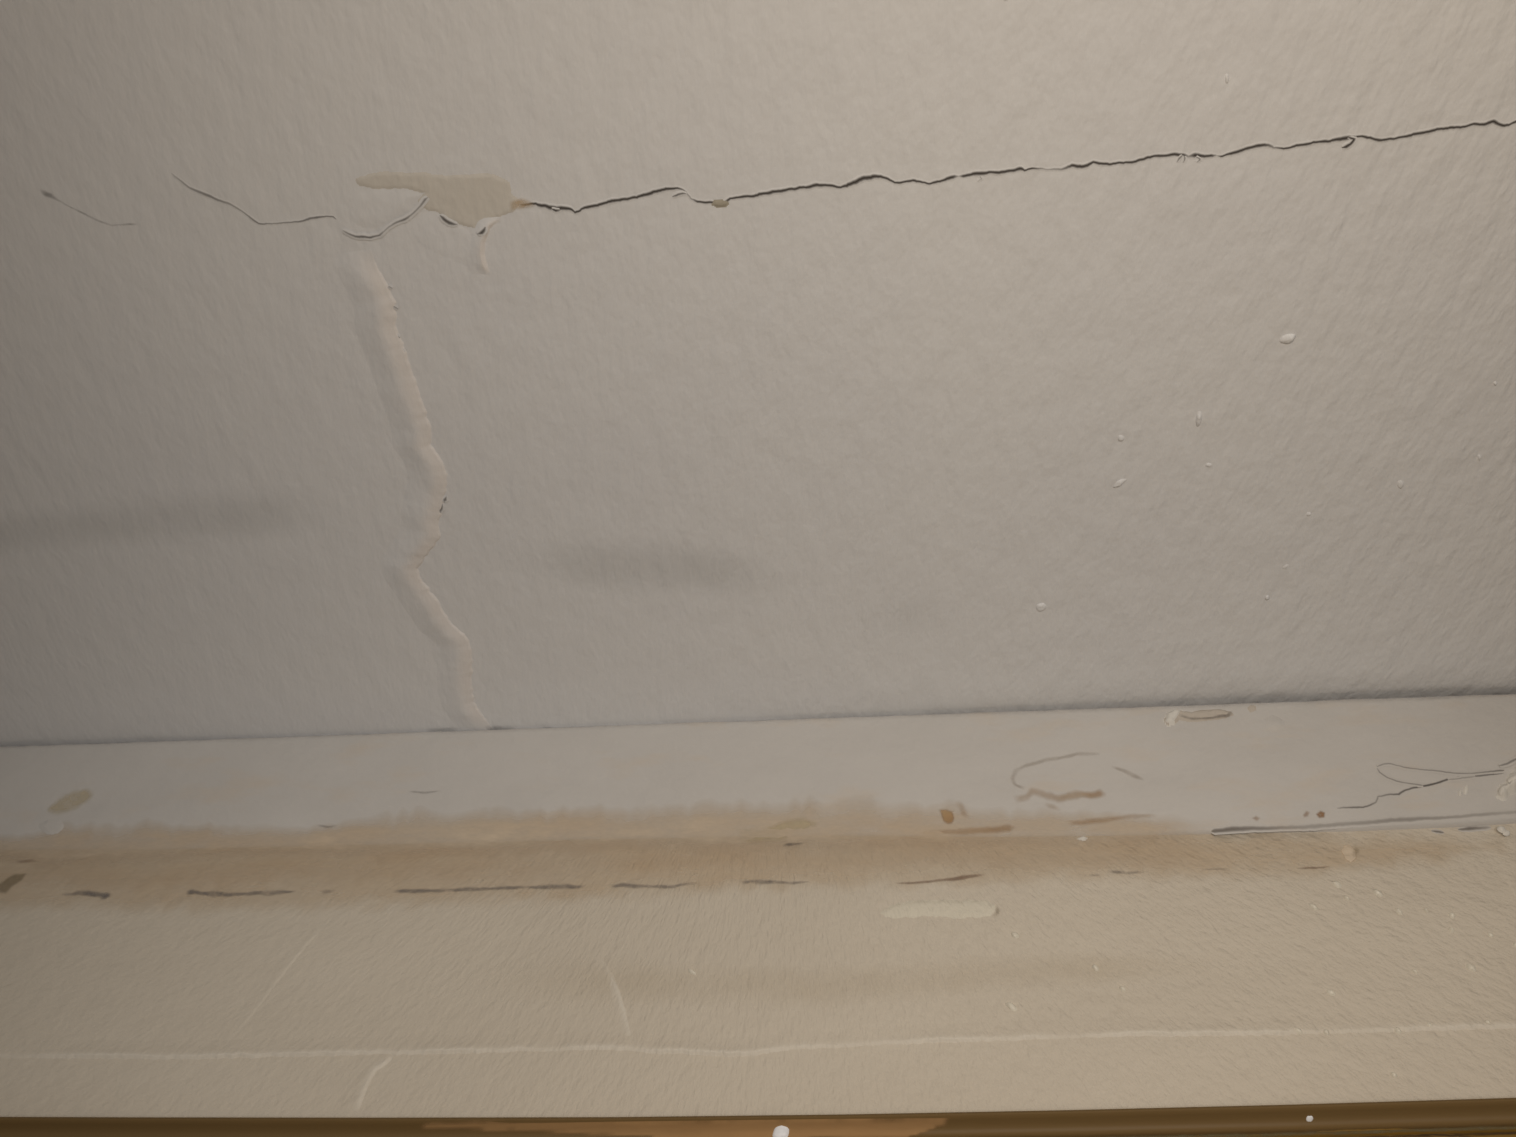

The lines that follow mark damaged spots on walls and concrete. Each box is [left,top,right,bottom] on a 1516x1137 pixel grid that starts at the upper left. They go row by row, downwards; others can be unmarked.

crack [521,117,1516,215]
crack [171,173,430,241]
crack [1211,756,1516,835]
damp [0,810,993,861]
crack [84,891,108,899]